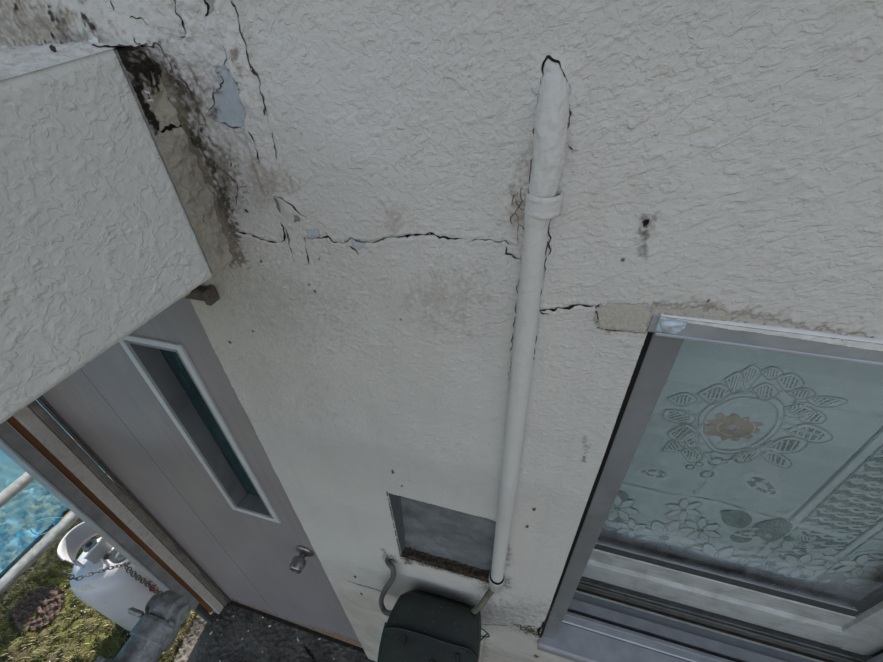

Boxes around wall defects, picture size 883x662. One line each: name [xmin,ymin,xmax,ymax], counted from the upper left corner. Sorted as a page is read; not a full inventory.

crack [110,0,277,162]
peeling [208,64,246,127]
crack [537,55,579,151]
leakage [118,49,245,267]
crack [221,159,532,263]
crack [508,282,519,378]
crack [533,219,639,360]